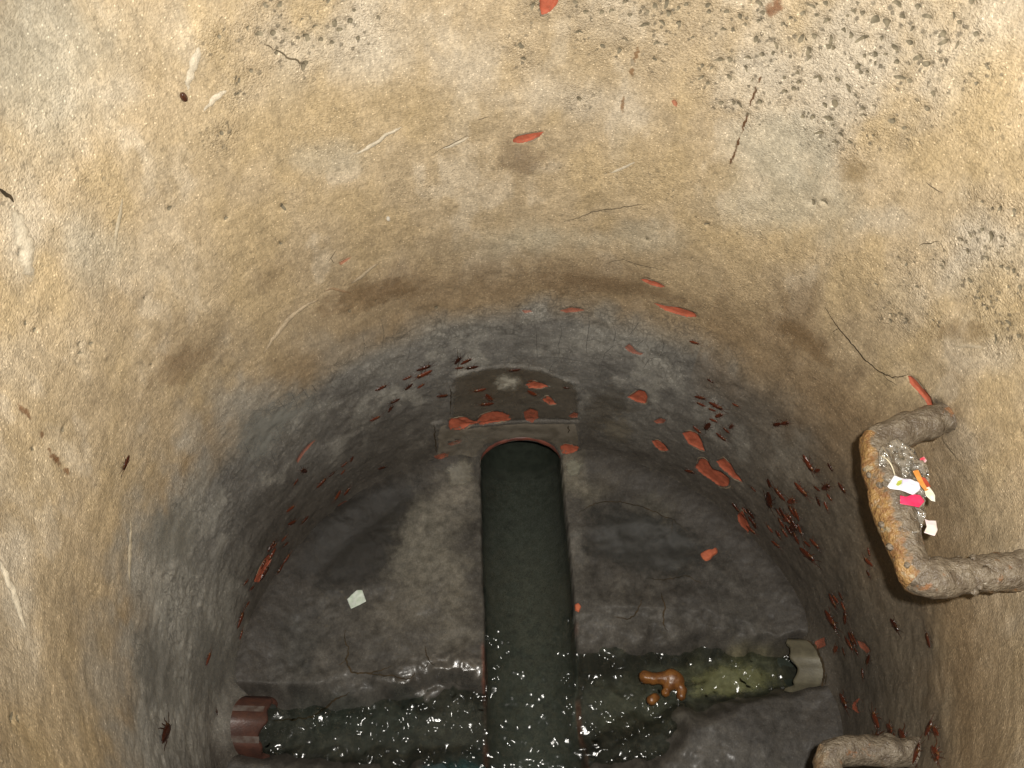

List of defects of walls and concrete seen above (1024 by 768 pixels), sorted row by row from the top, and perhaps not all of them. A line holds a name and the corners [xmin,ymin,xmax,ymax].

spalling [531,0,558,17]
spalling [573,0,688,27]
spalling [720,0,765,32]
spalling [698,36,792,85]
spalling [513,132,543,143]
spalling [655,303,696,318]
crack [825,308,908,386]
spalling [524,380,557,422]
spalling [628,390,648,405]
spalling [908,376,933,405]
spalling [449,411,511,431]
spalling [682,430,742,489]